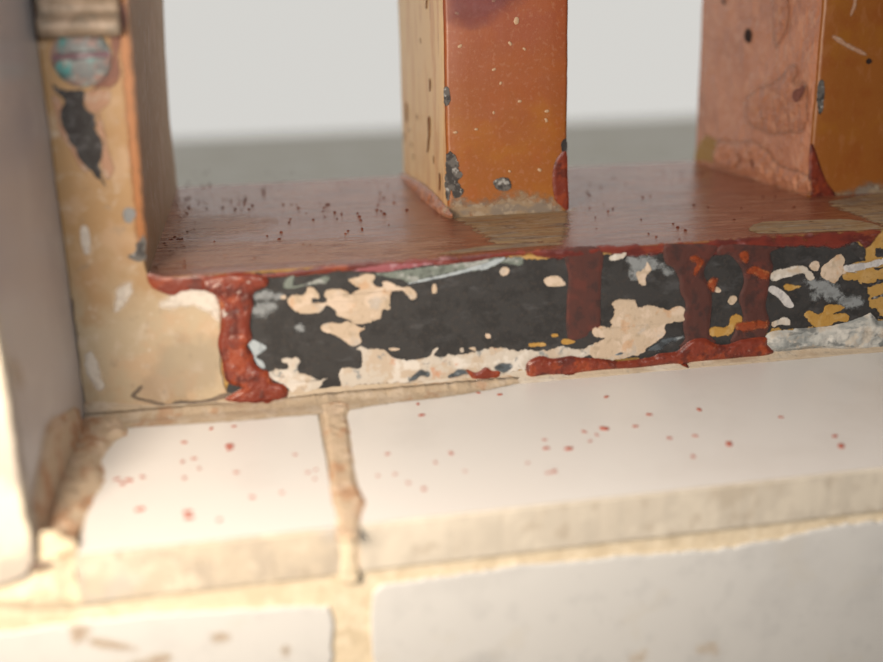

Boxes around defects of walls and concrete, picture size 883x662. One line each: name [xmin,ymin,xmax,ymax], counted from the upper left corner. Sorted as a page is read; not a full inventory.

peeling [52,84,114,186]
peeling [749,219,883,234]
peeling [246,243,685,392]
peeling [703,254,744,345]
peeling [766,242,883,333]